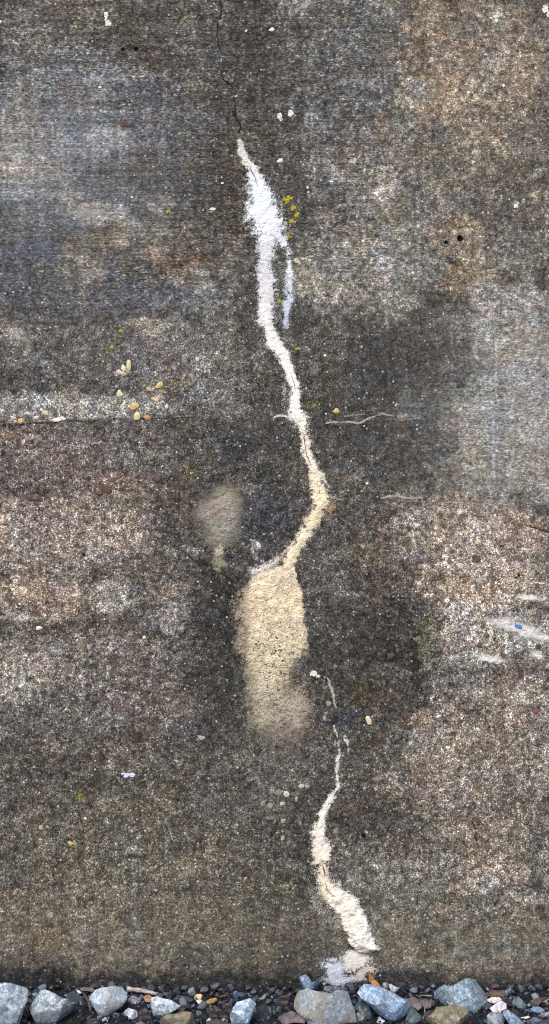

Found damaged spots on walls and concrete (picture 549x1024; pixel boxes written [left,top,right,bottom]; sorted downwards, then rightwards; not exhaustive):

crack [217,3,241,136]
leakage [232,139,343,765]
leakage [325,412,393,424]
leakage [307,725,385,987]